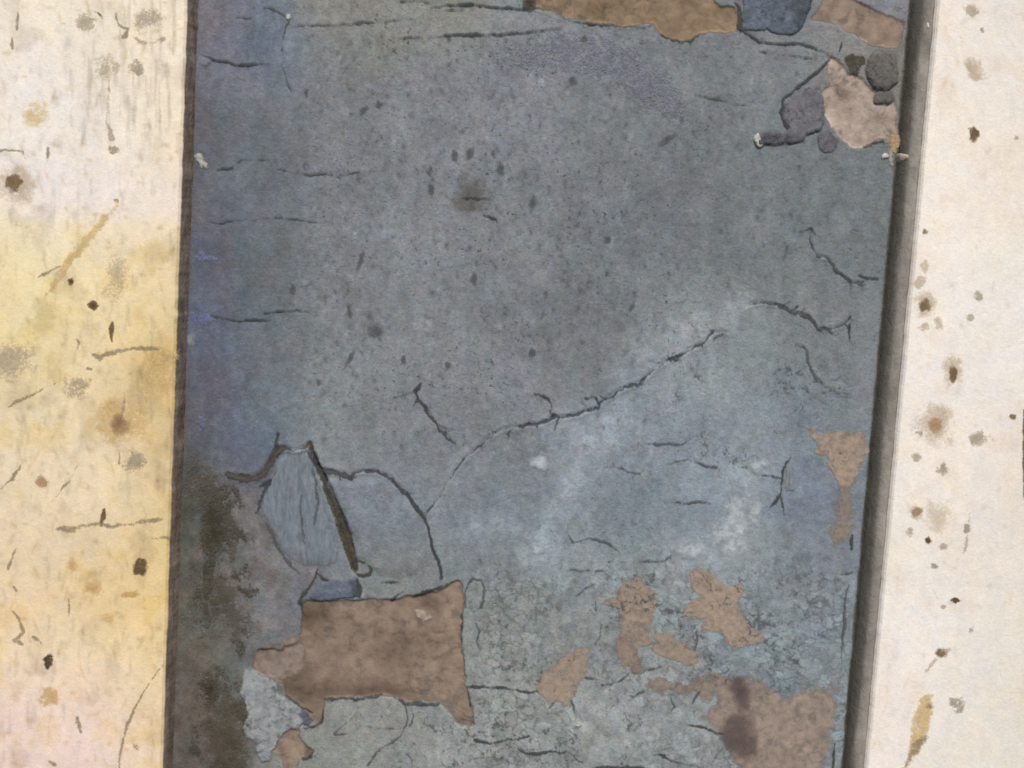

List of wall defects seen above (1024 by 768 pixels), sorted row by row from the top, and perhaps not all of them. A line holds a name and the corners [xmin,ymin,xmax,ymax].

spalling [531,0,743,42]
spalling [811,0,904,48]
spalling [822,58,897,158]
crack [807,227,879,286]
crack [393,330,723,478]
mould [181,454,259,655]
crack [225,432,443,605]
peeling [806,426,869,546]
mould [190,667,249,768]
spalling [240,581,474,768]
peeling [536,646,589,706]
peeling [604,568,837,768]